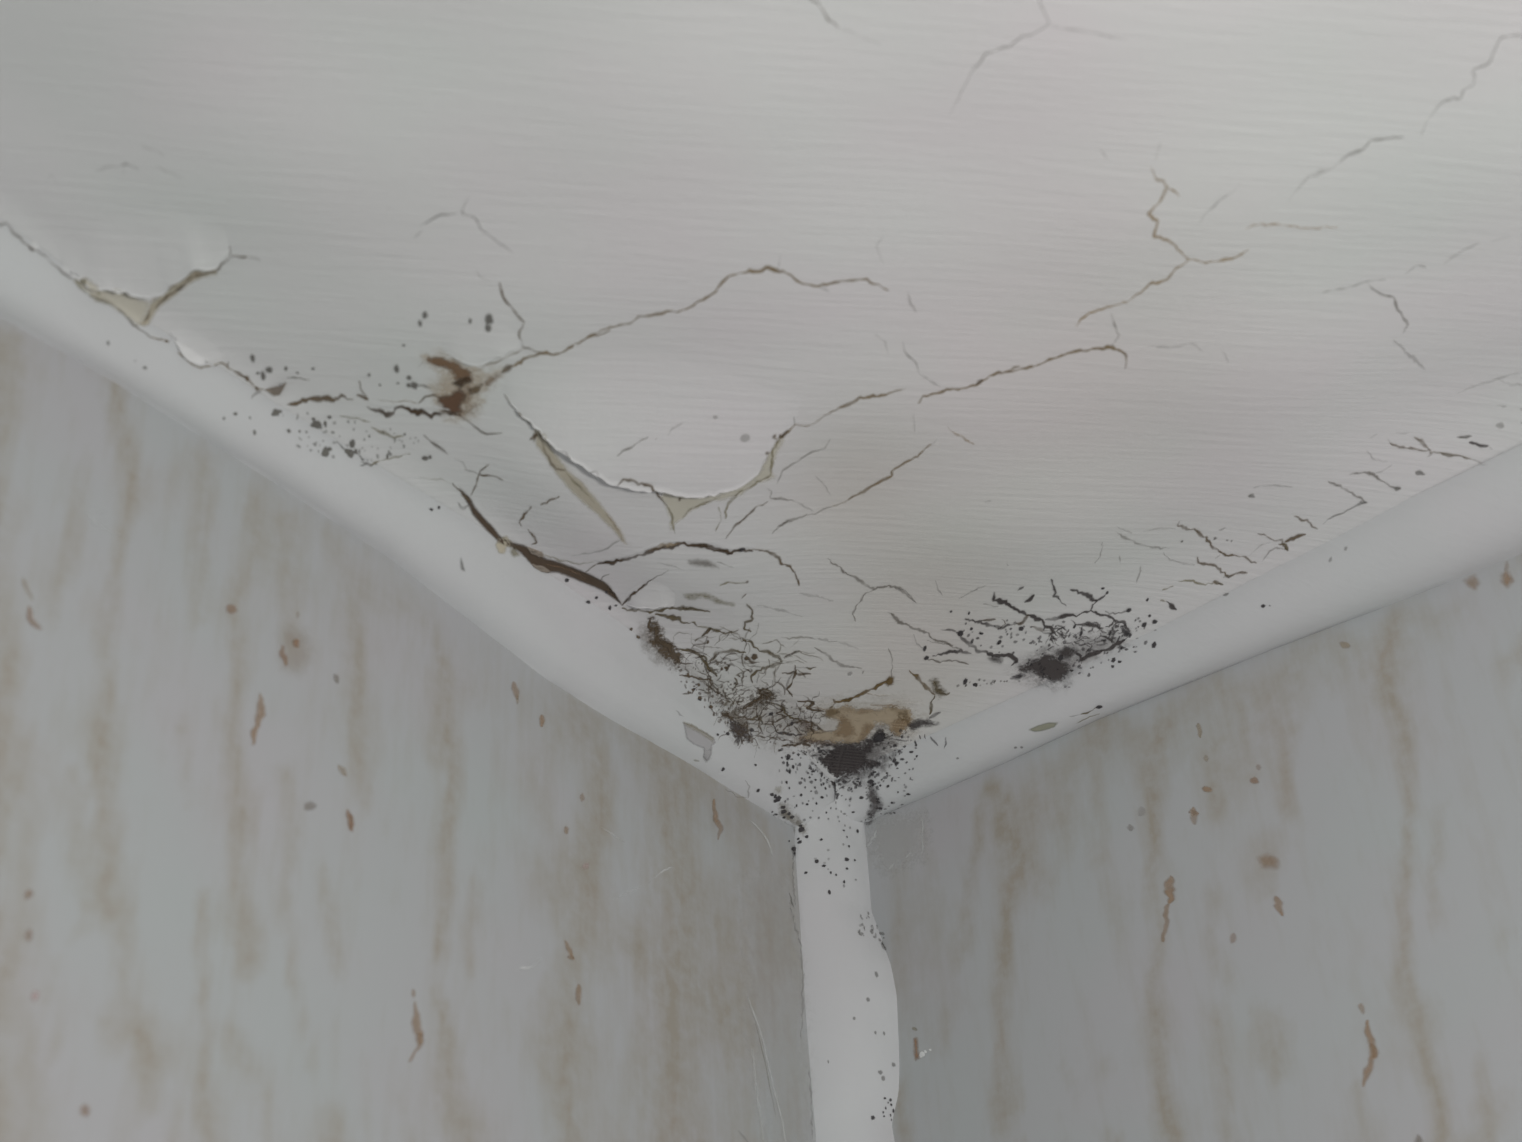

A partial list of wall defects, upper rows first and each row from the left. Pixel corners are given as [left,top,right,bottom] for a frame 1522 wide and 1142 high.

crack [0,225,73,280]
peeling [56,209,247,365]
crack [165,266,889,495]
crack [575,177,1338,632]
crack [519,496,560,545]
peeling [530,429,624,541]
crack [1161,435,1489,610]
crack [829,559,960,649]
leakage [923,579,1158,687]
leakage [630,617,946,894]